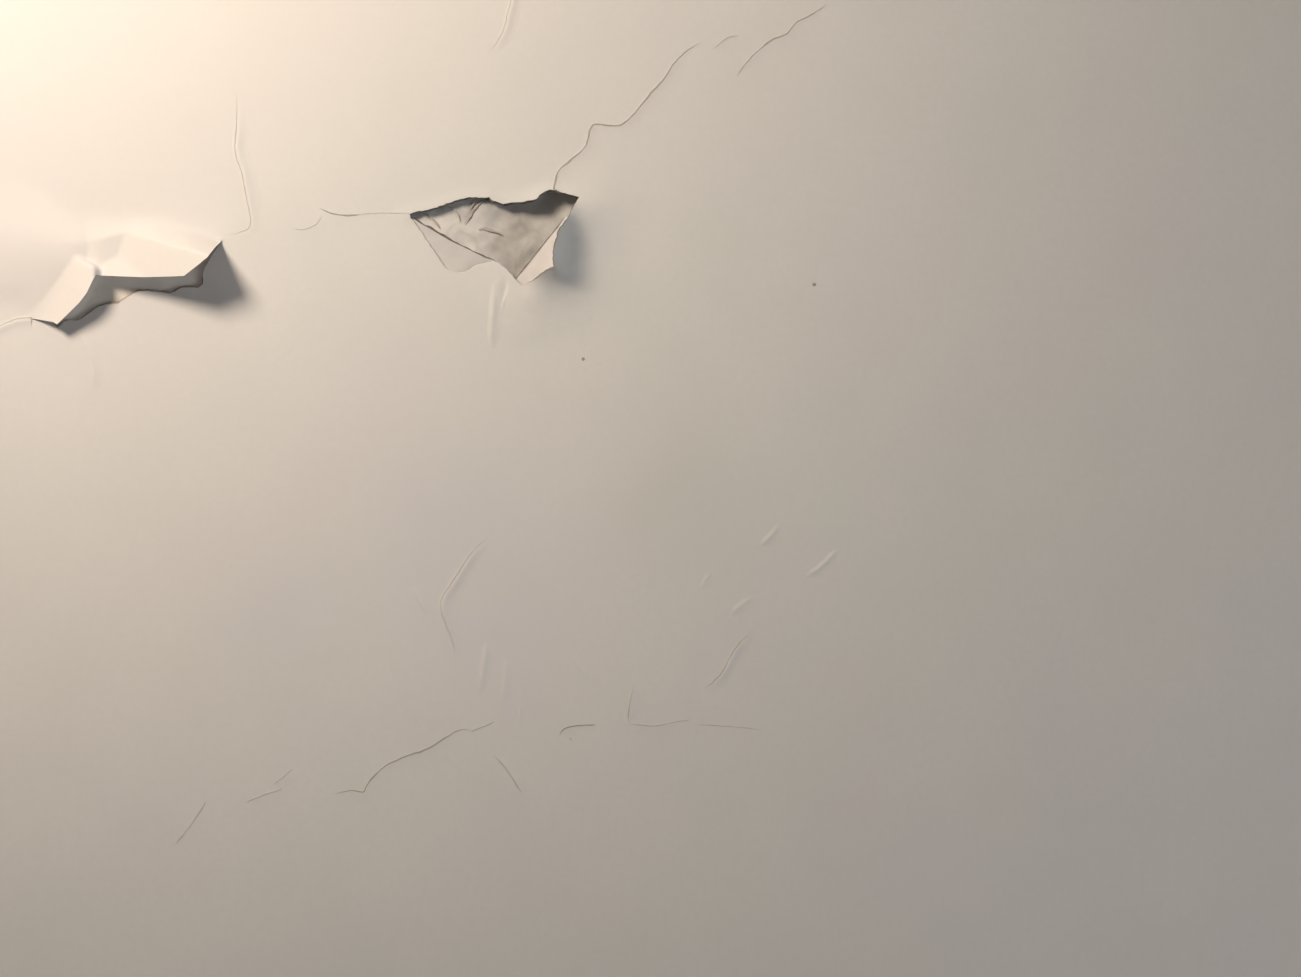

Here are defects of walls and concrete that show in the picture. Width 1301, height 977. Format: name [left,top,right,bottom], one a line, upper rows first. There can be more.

crack [551,5,826,192]
peeling [0,129,330,403]
spalling [344,135,691,357]